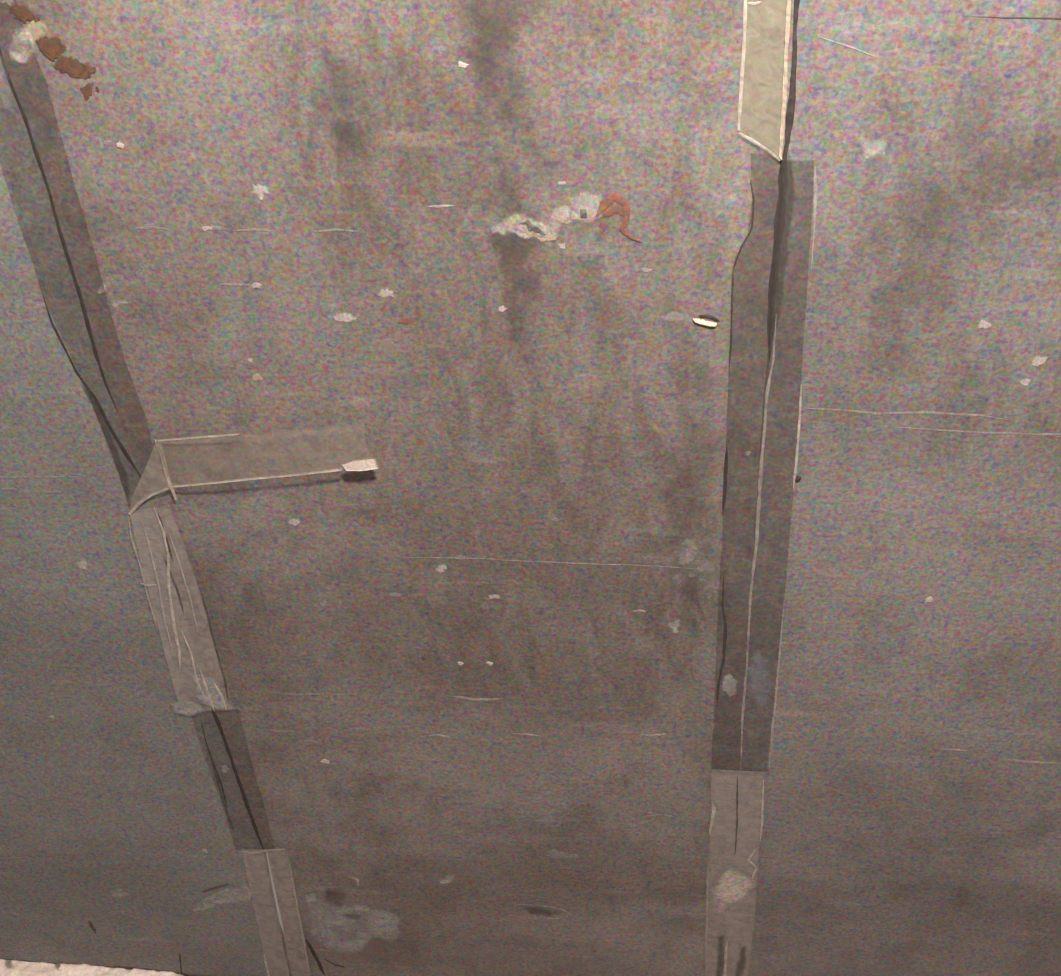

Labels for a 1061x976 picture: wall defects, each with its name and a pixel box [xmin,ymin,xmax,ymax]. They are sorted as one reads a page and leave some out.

corrosion [0,0,99,100]
crack [0,49,142,492]
peeling [491,193,641,249]
crack [698,0,800,366]
crack [721,446,729,515]
crack [716,577,727,704]
crack [201,707,264,850]